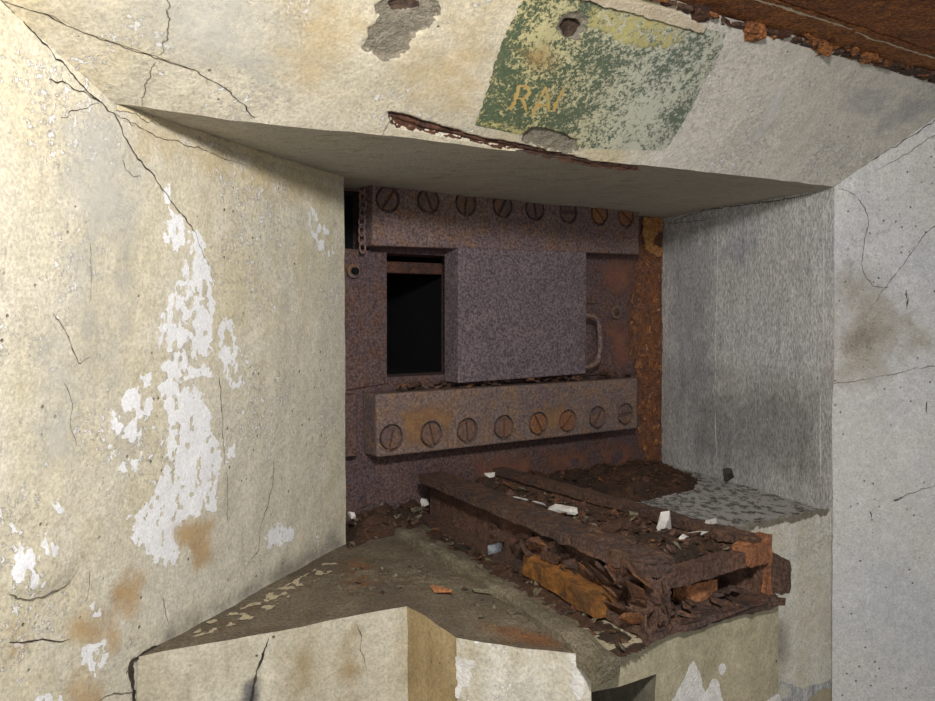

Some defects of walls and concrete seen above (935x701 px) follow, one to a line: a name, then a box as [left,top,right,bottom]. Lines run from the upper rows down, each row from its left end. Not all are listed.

spalling [361,0,441,61]
flaking render [582,0,707,33]
corrosion [650,0,935,84]
crack [1,0,255,285]
crack [872,120,935,171]
crack [667,189,935,314]
corrosion [525,217,664,462]
peeling [108,183,252,568]
corrosion [394,379,514,392]
peeling [9,522,59,590]
crack [250,639,269,701]
peeling [672,661,726,701]